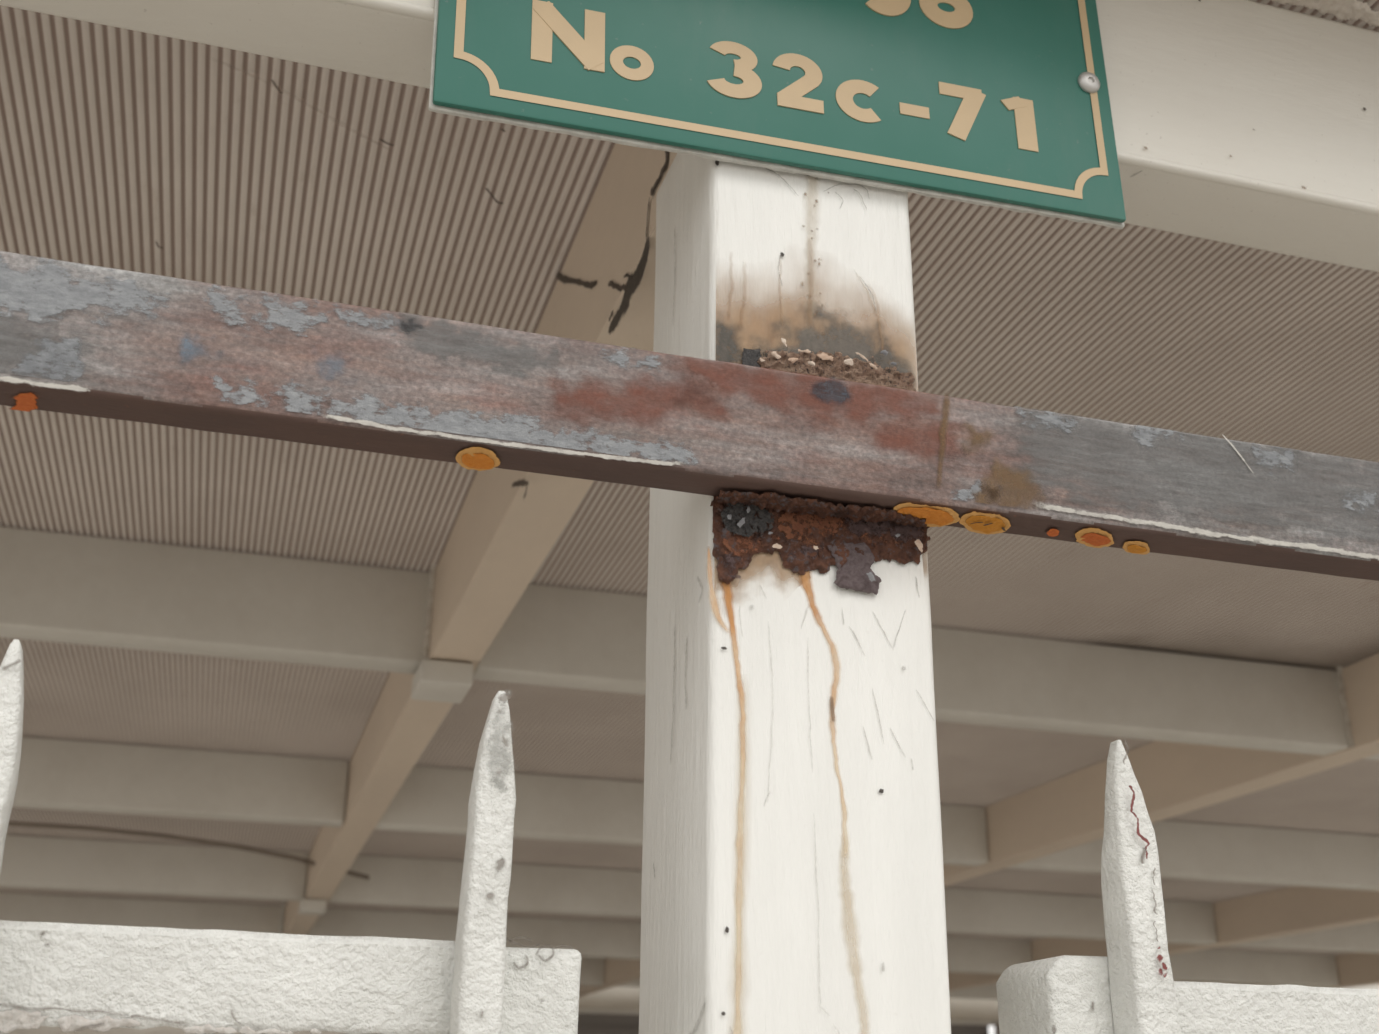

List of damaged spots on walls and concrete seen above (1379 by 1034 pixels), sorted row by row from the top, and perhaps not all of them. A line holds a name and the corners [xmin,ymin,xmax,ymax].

crack [556,151,668,333]
peeling [0,255,169,391]
peeling [204,285,558,376]
corrosion [11,392,38,412]
peeling [213,376,698,466]
corrosion [455,447,500,471]
peeling [952,481,982,501]
peeling [1015,406,1379,560]
corrosion [708,463,1037,1034]
spalling [0,1004,321,1034]